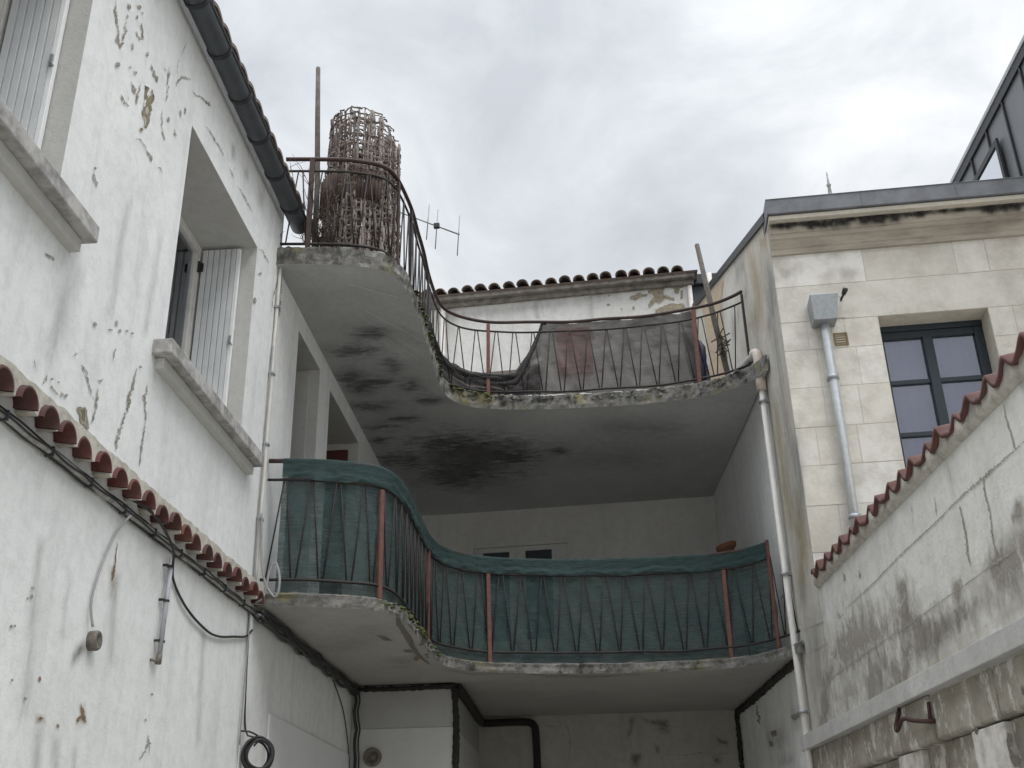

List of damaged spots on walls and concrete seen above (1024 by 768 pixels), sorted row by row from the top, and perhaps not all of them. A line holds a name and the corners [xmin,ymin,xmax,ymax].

peeling [116,52,158,131]
leakage [779,203,1024,228]
peeling [461,280,741,403]
spalling [77,407,89,430]
crack [802,401,1024,683]
leakage [989,533,1024,587]
leakage [820,580,965,724]